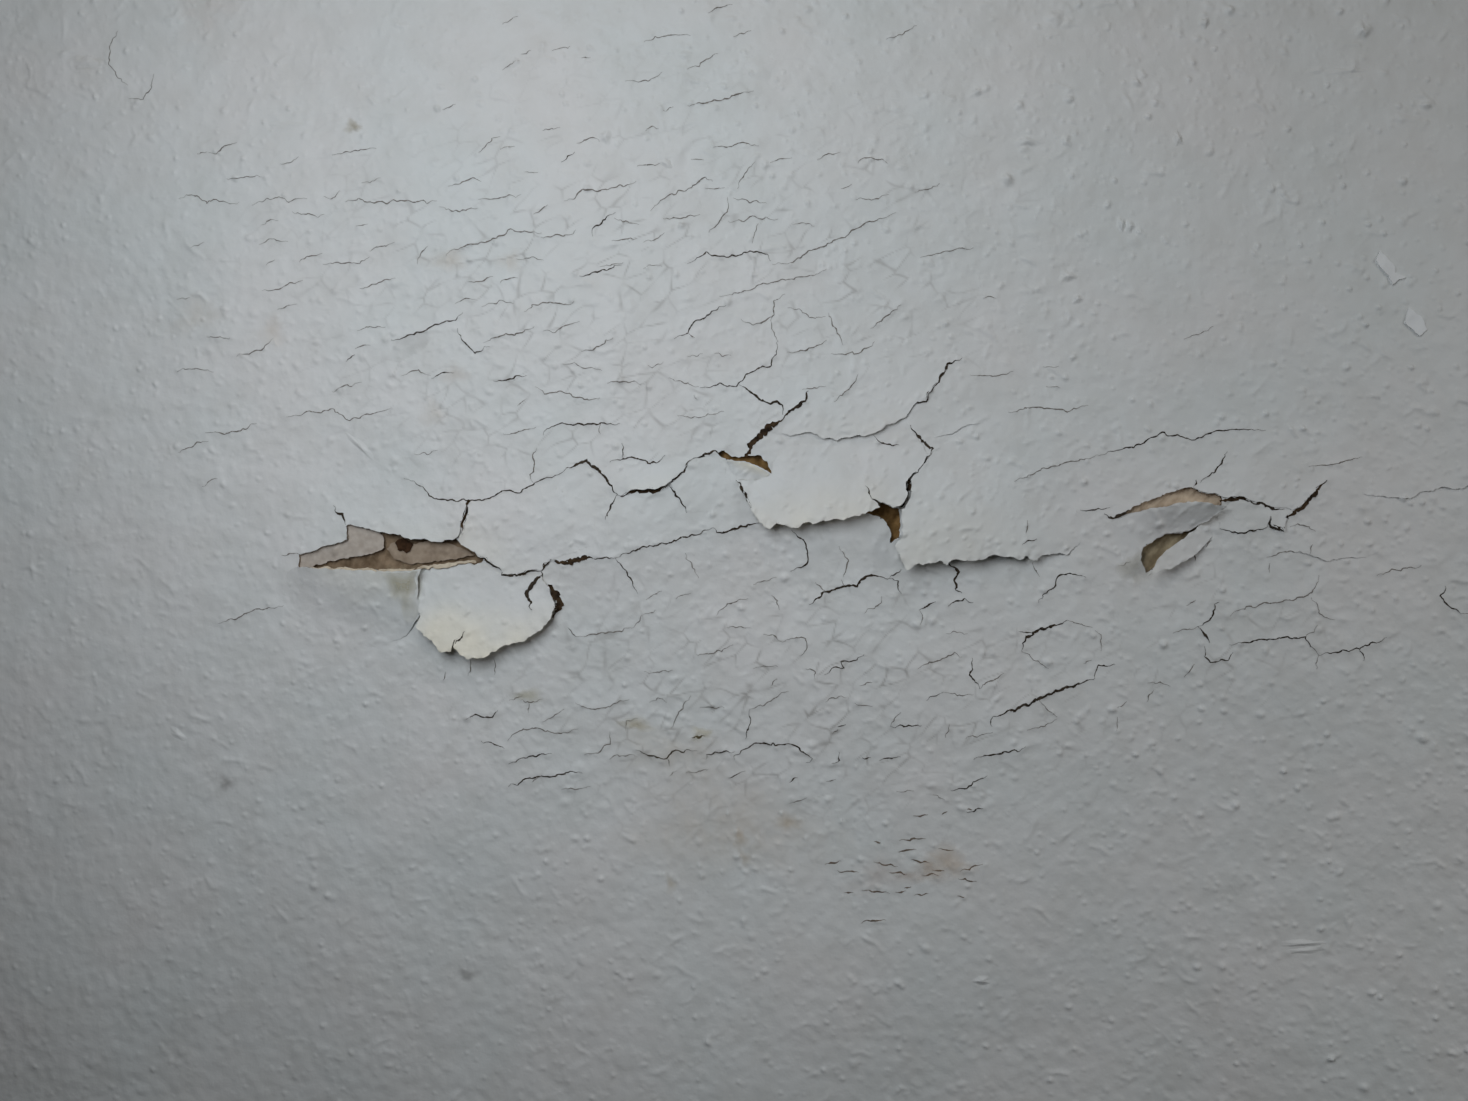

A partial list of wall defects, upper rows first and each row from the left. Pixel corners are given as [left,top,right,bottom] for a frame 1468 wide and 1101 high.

crack [627,4,751,129]
peeling [298,478,598,659]
crack [177,127,939,637]
peeling [603,347,1326,575]
crack [866,358,1086,507]
crack [1014,429,1381,727]
crack [443,520,1115,923]